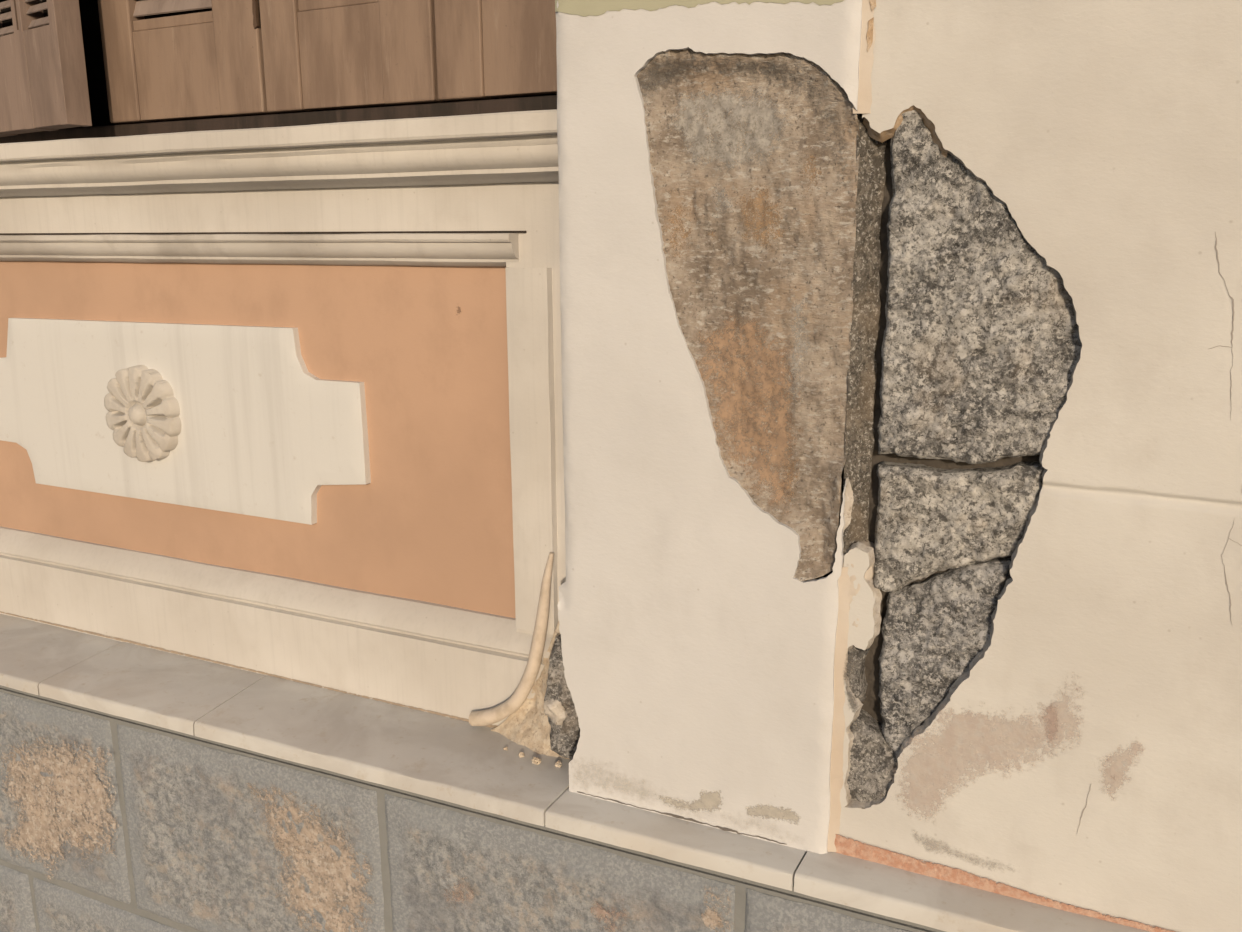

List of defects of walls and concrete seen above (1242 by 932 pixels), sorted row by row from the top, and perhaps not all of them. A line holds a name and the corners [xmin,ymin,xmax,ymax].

crack [1209,232,1234,420]
flaking render [637,48,1082,816]
crack [1221,522,1242,623]